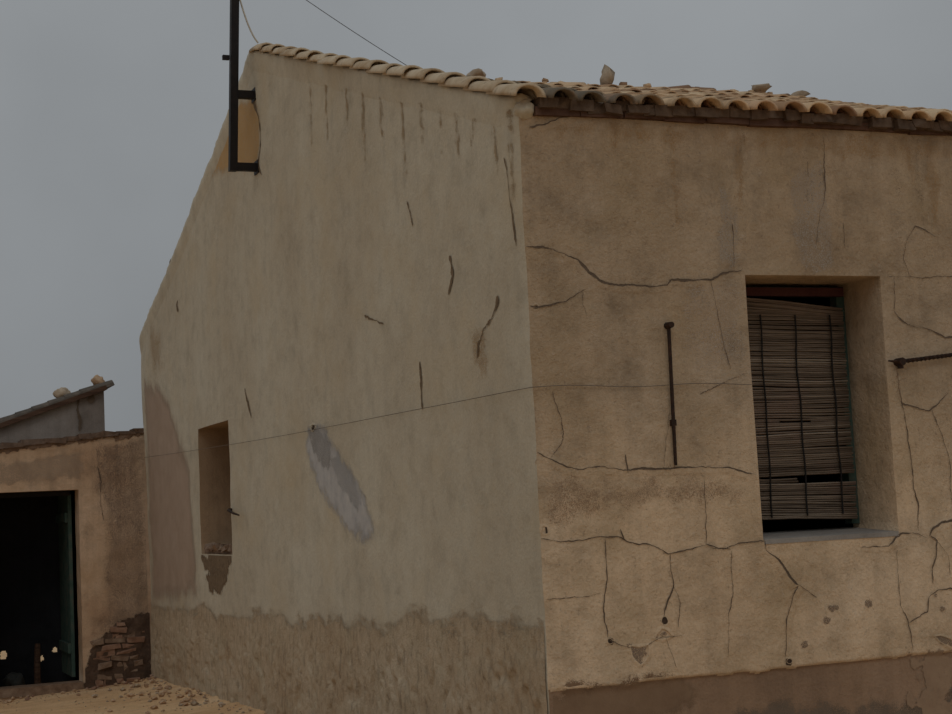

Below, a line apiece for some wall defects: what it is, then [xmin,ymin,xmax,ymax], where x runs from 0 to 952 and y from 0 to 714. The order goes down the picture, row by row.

crack [446,255,454,295]
crack [504,159,746,394]
crack [888,226,952,338]
crack [477,296,499,356]
spalling [0,433,143,454]
crack [535,396,817,666]
crack [860,374,952,645]
spalling [201,555,232,595]
spalling [84,612,151,688]
flaking render [553,642,708,714]